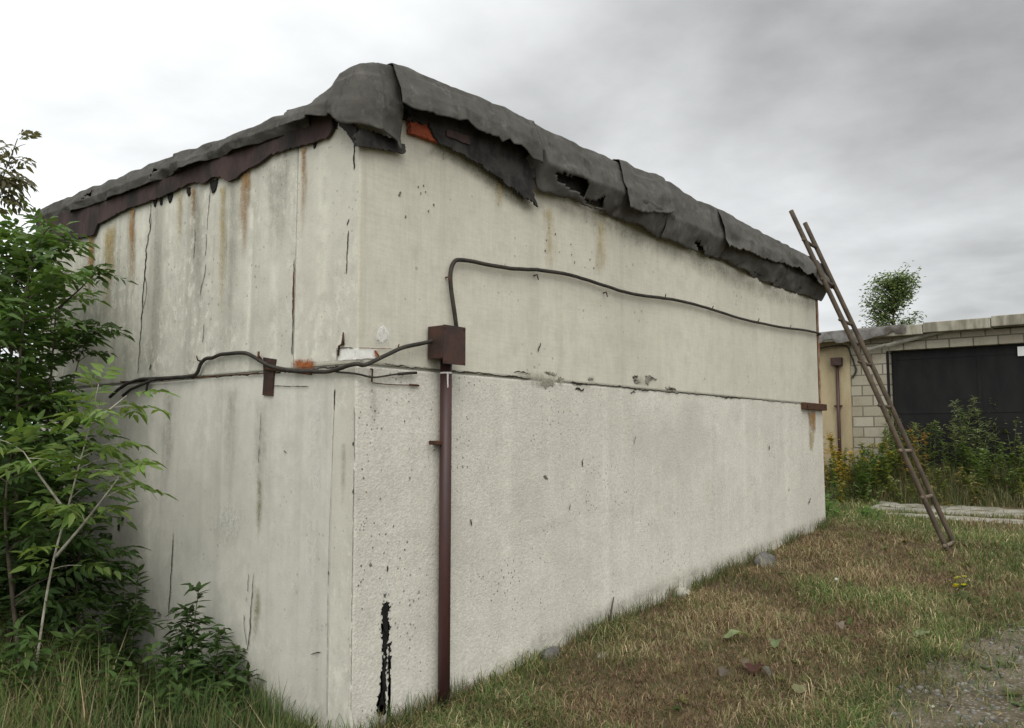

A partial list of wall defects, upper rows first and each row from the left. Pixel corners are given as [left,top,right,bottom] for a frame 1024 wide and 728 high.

crack [343,220,351,275]
crack [122,204,163,383]
peeling [338,348,356,361]
spalling [527,371,564,389]
spalling [632,375,676,391]
crack [189,264,355,575]
crack [166,541,174,613]
crack [310,602,352,665]